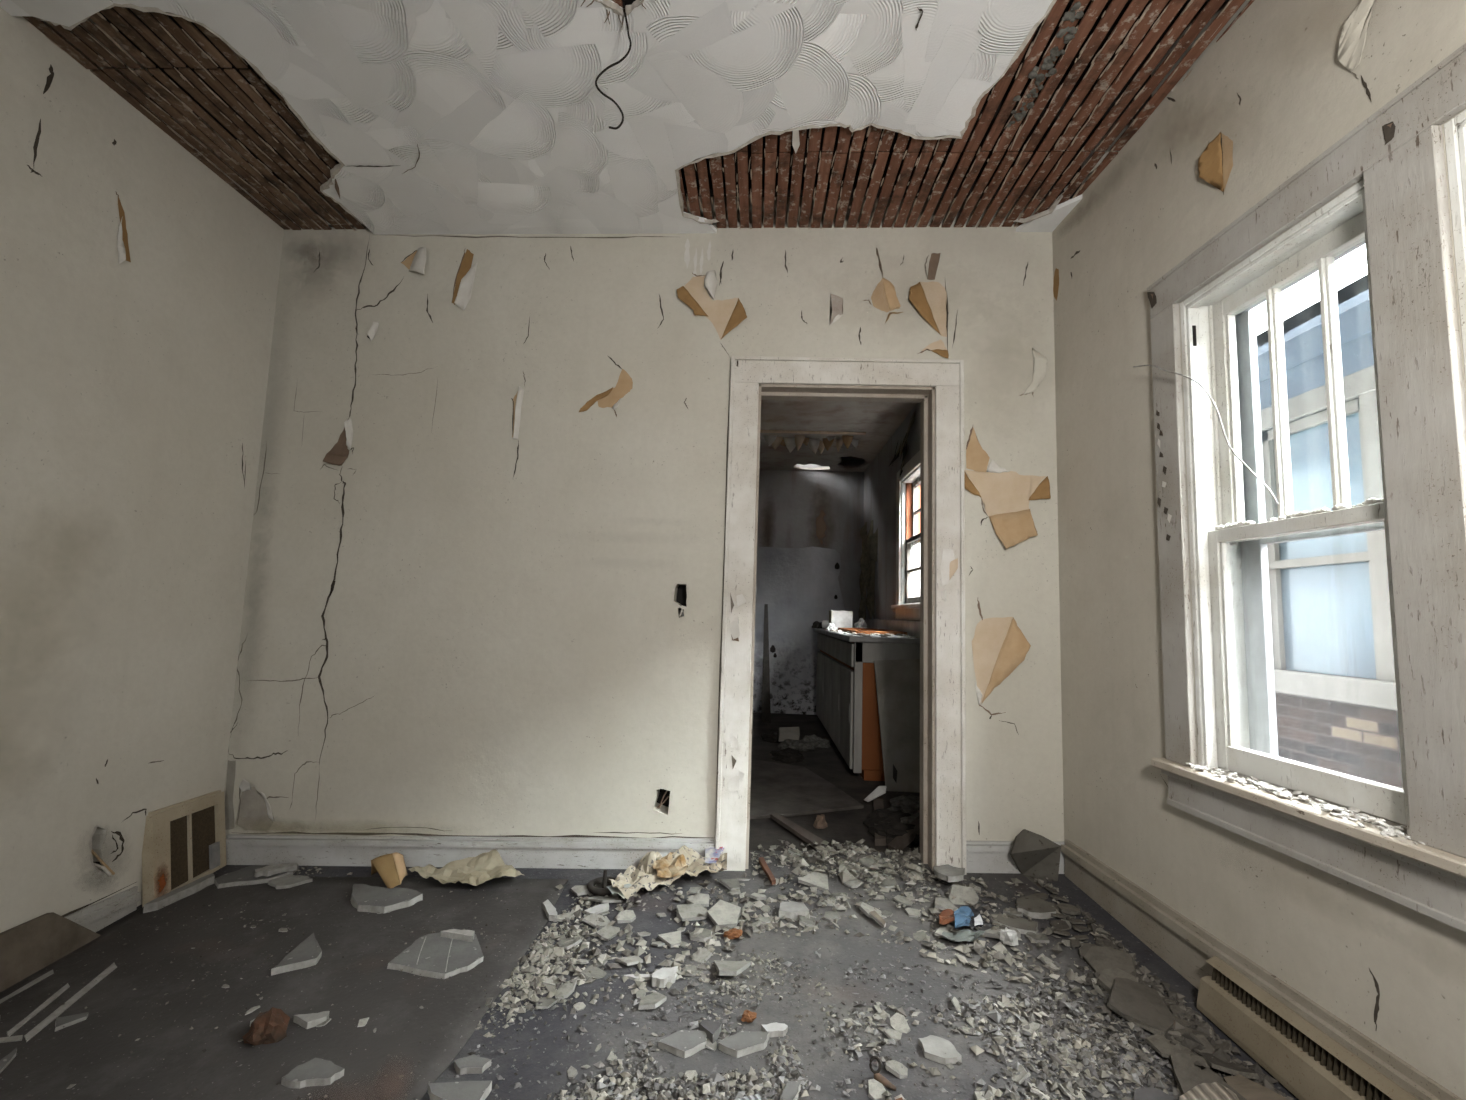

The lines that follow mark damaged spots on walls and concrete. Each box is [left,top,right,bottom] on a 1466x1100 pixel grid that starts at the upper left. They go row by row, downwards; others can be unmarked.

spalling [594,0,644,17]
peeling [1338,0,1375,101]
spalling [40,3,363,225]
spalling [675,0,1057,227]
peeling [1198,132,1233,194]
peeling [451,249,478,310]
peeling [677,270,747,340]
peeling [864,248,949,358]
peeling [579,356,633,417]
peeling [964,427,1051,549]
crack [228,367,731,838]
peeling [972,599,1031,719]